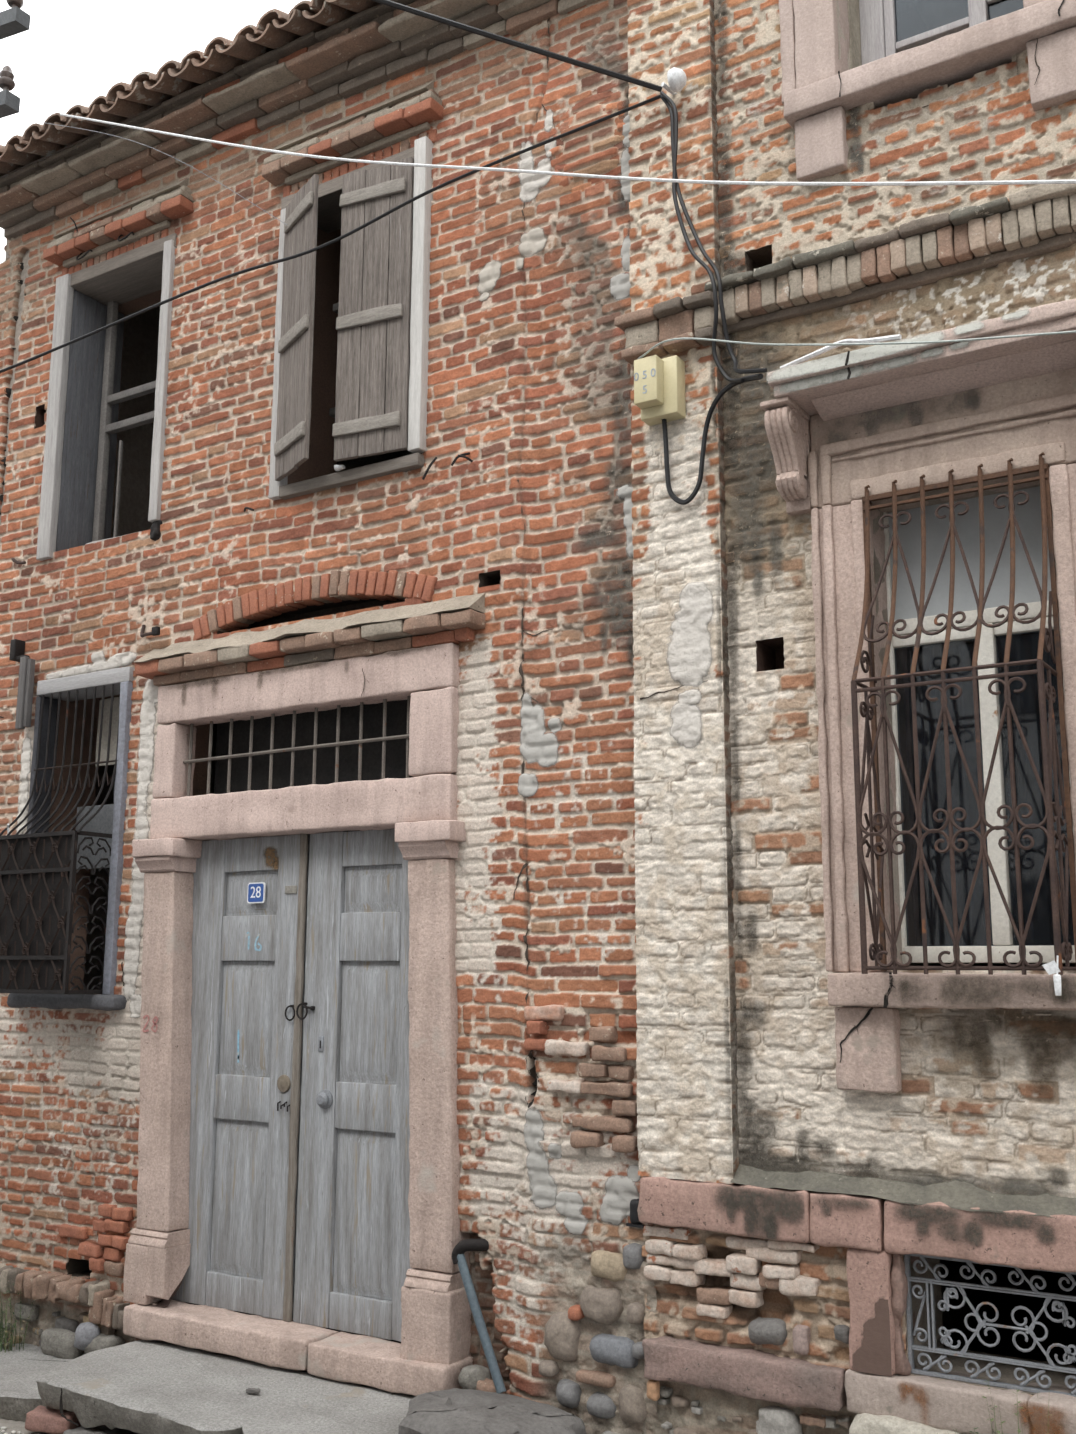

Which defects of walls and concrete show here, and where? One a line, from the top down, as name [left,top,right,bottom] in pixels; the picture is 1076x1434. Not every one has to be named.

crack [840,972,895,1063]
leakage [949,978,1073,1092]
spalling [524,1004,640,1182]
peeling [555,1191,588,1235]
leakage [897,1203,1054,1245]
leakage [912,1169,1066,1195]
spalling [539,1223,822,1424]
spalling [834,1254,920,1377]